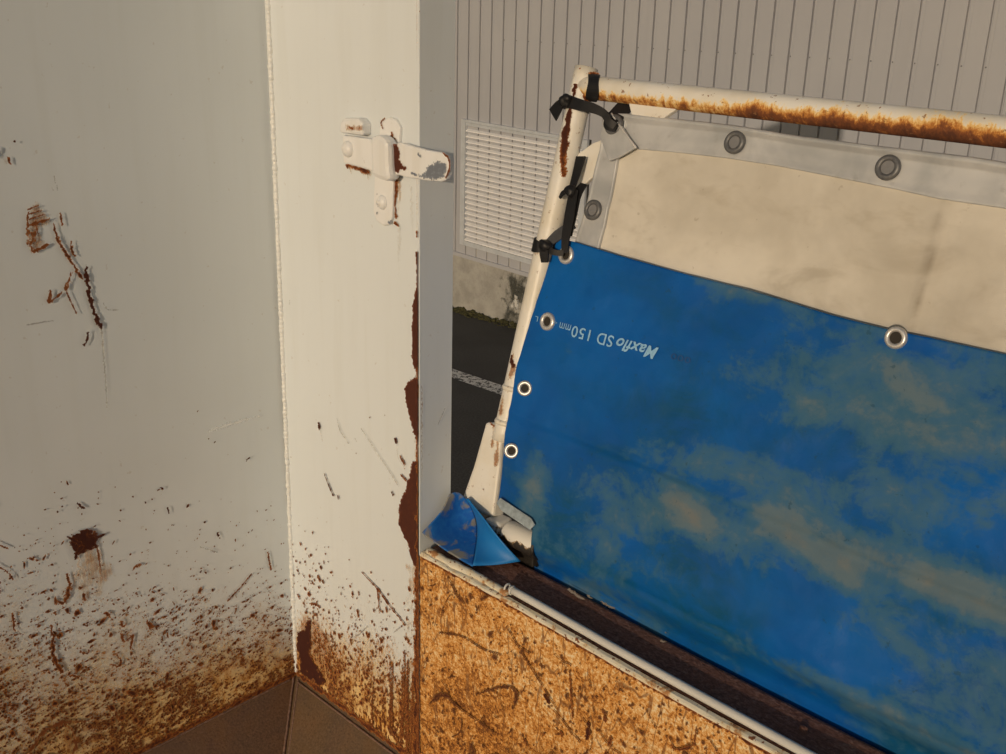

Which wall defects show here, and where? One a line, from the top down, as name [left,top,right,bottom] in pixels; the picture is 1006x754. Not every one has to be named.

corrosion [559,108,572,177]
corrosion [26,205,50,253]
corrosion [388,179,400,227]
corrosion [0,492,771,754]